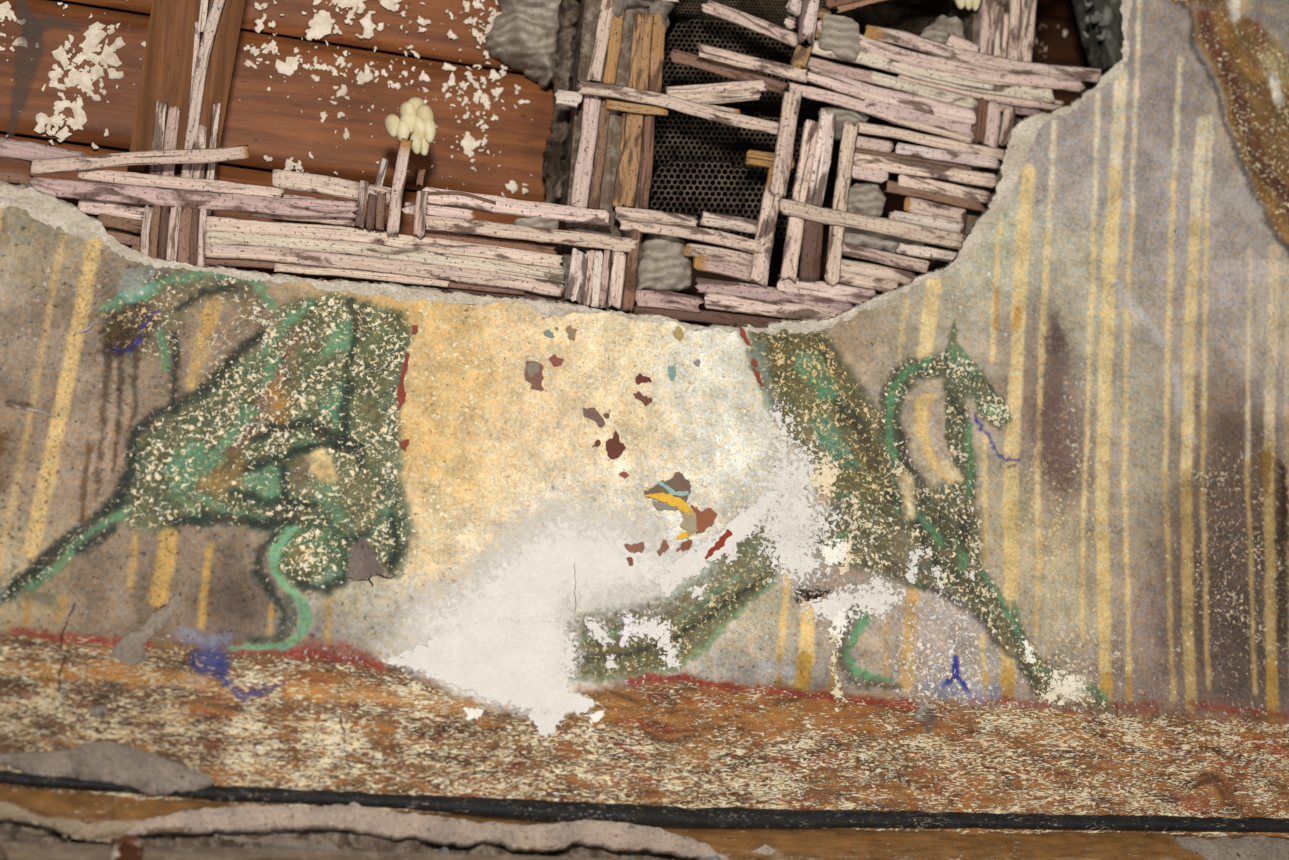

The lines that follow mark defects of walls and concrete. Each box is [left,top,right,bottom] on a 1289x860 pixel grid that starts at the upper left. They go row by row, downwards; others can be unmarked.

peeling [0,0,1133,738]
crack [58,603,76,690]
rust [114,841,144,860]
flaking render [1174,835,1289,860]